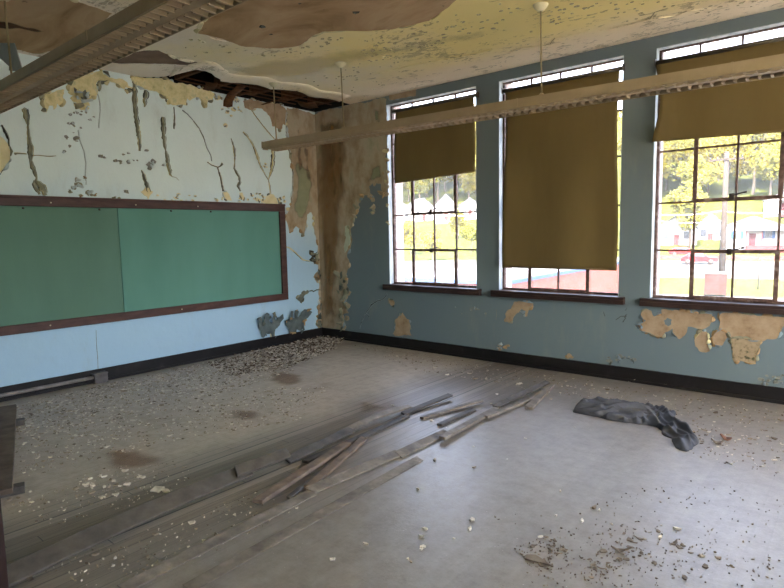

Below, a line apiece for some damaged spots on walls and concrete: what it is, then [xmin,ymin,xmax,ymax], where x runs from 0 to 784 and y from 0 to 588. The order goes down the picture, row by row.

peeling [0,0,112,54]
peeling [113,0,519,91]
crack [132,81,149,151]
spalling [39,69,416,153]
crack [1,108,54,196]
peeling [98,149,165,170]
crack [141,170,153,199]
crack [161,107,294,201]
spalling [214,135,390,338]
spalling [388,298,411,337]
spalling [504,300,533,323]
spalling [635,308,784,364]